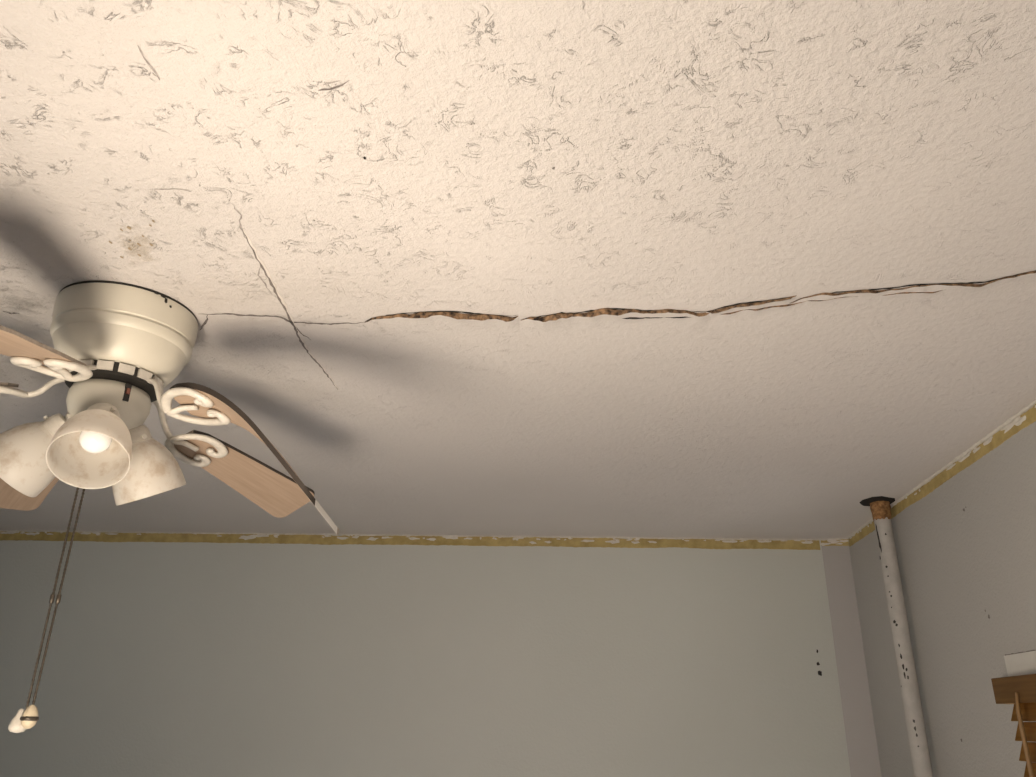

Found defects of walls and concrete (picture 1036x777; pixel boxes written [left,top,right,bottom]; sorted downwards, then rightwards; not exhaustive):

crack [200,203,1036,390]
peeling [891,400,1036,519]
peeling [0,519,889,577]